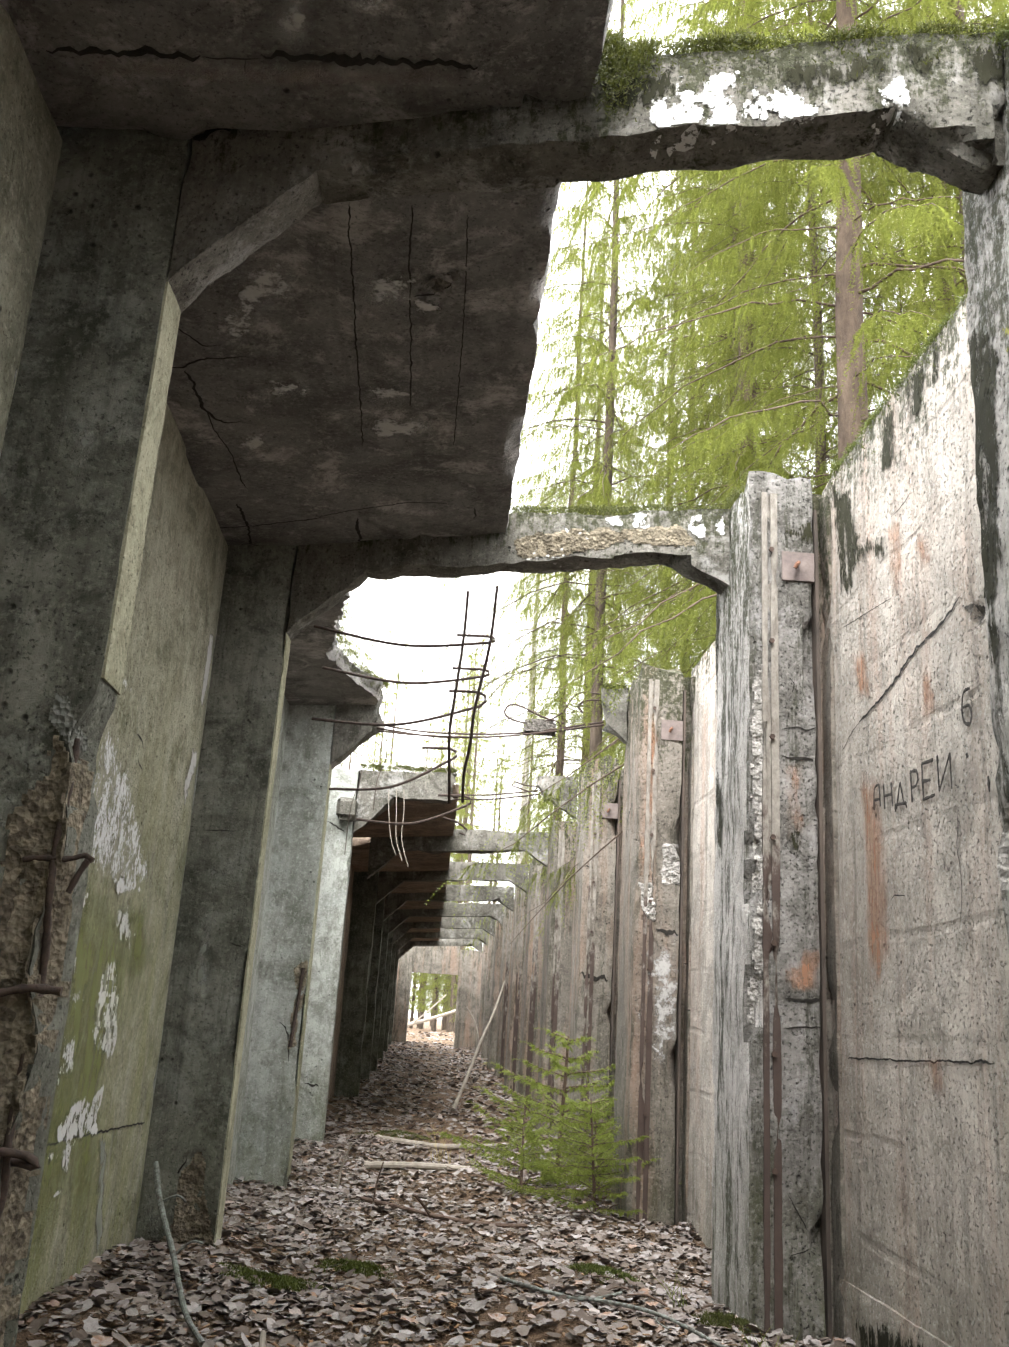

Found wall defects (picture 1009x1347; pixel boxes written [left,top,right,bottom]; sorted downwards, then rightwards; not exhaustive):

crack [46,45,478,70]
peeling [648,71,819,159]
peeling [872,75,916,134]
water stain [852,536,884,565]
corrosion [863,789,886,979]
spalling [0,693,148,1347]